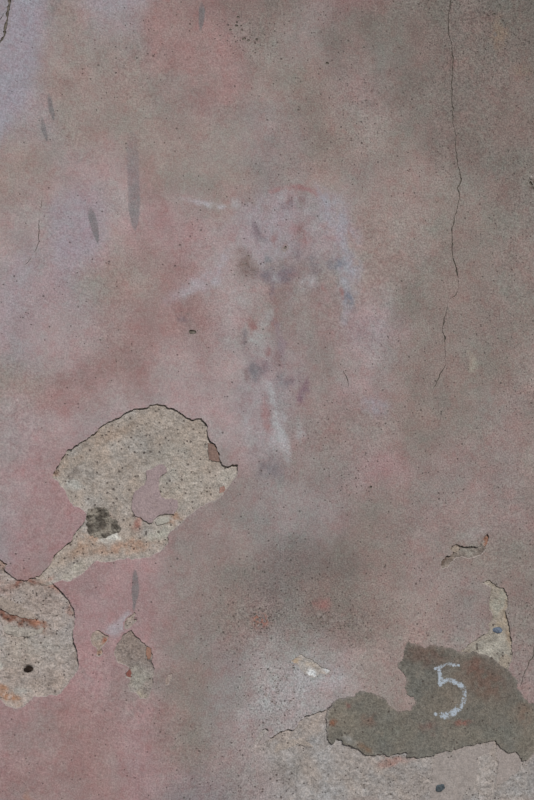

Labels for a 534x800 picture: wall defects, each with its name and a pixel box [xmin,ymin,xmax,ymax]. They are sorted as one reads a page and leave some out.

crack [0,0,11,43]
crack [433,0,462,388]
spalling [0,404,238,709]
spalling [441,534,489,569]
spalling [291,654,331,678]
spalling [462,580,513,670]
spalling [236,706,534,800]